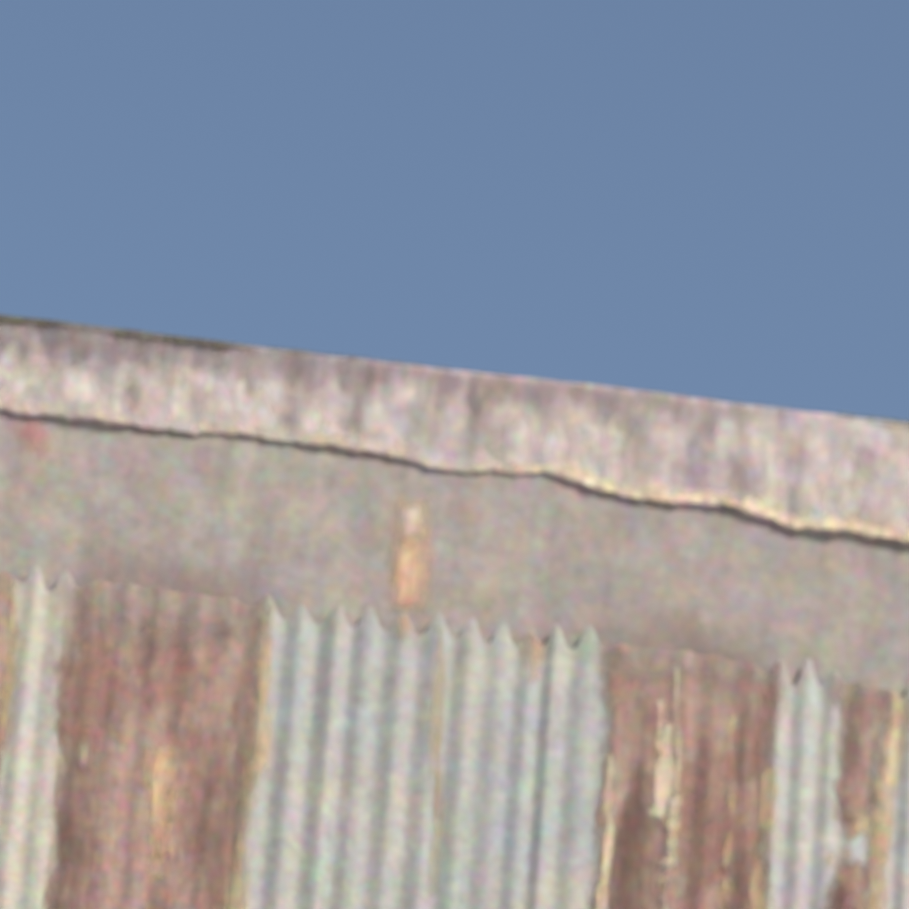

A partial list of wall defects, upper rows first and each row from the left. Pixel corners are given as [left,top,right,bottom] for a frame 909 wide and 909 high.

corrosion [0,572,15,740]
corrosion [45,579,272,909]
corrosion [396,502,428,634]
corrosion [596,643,778,909]
corrosion [831,679,906,909]